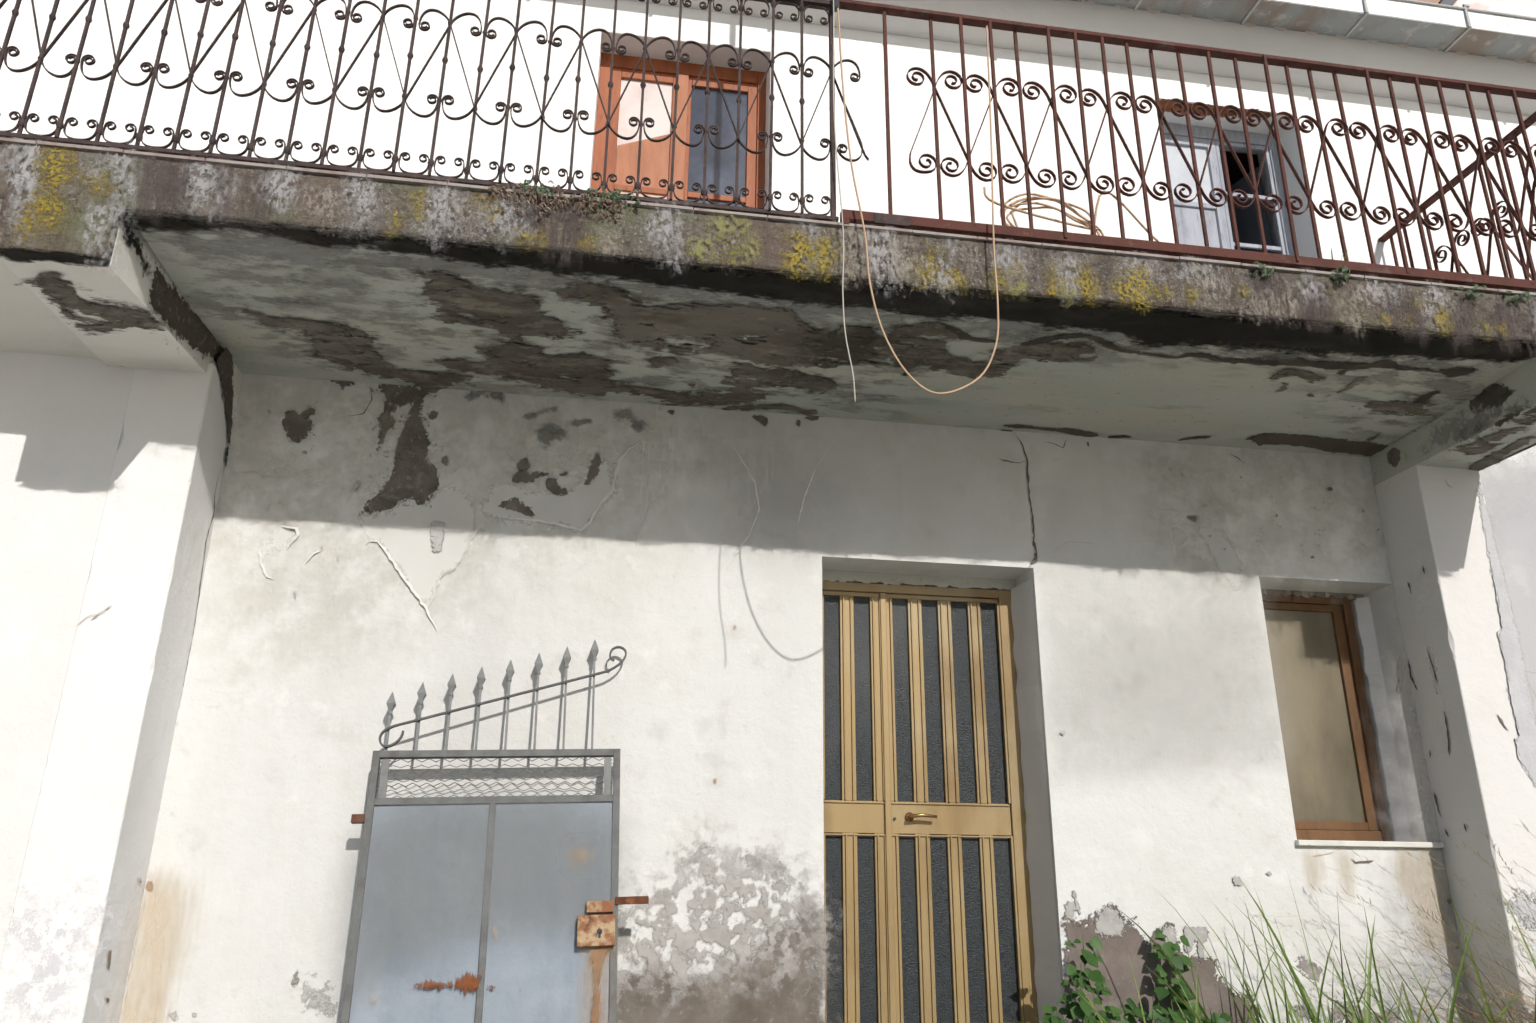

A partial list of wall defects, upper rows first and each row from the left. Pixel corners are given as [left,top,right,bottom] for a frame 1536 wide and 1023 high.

damp [15,145,39,189]
flaking render [0,247,234,466]
damp [85,154,1536,424]
flaking render [152,217,1536,786]
crack [998,433,1038,567]
peeling [291,971,338,1017]
damp [617,843,831,1023]
peeling [1506,888,1536,935]